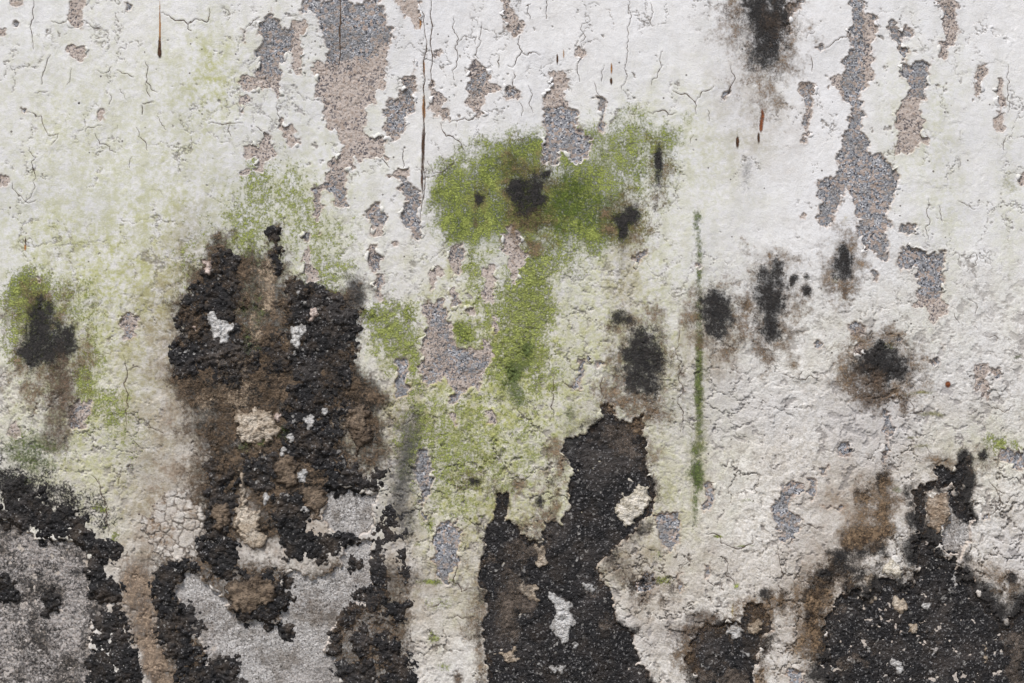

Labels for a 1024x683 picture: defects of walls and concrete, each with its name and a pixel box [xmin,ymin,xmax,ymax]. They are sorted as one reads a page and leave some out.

water stain [0,223,419,683]
peeling [238,0,451,302]
crack [381,1,547,218]
water stain [501,151,555,256]
peeling [541,71,606,165]
water stain [466,305,684,683]
water stain [652,144,672,210]
water stain [721,0,799,110]
water stain [681,230,868,367]
water stain [670,449,1024,683]
peeling [798,0,949,324]
water stain [835,325,932,413]